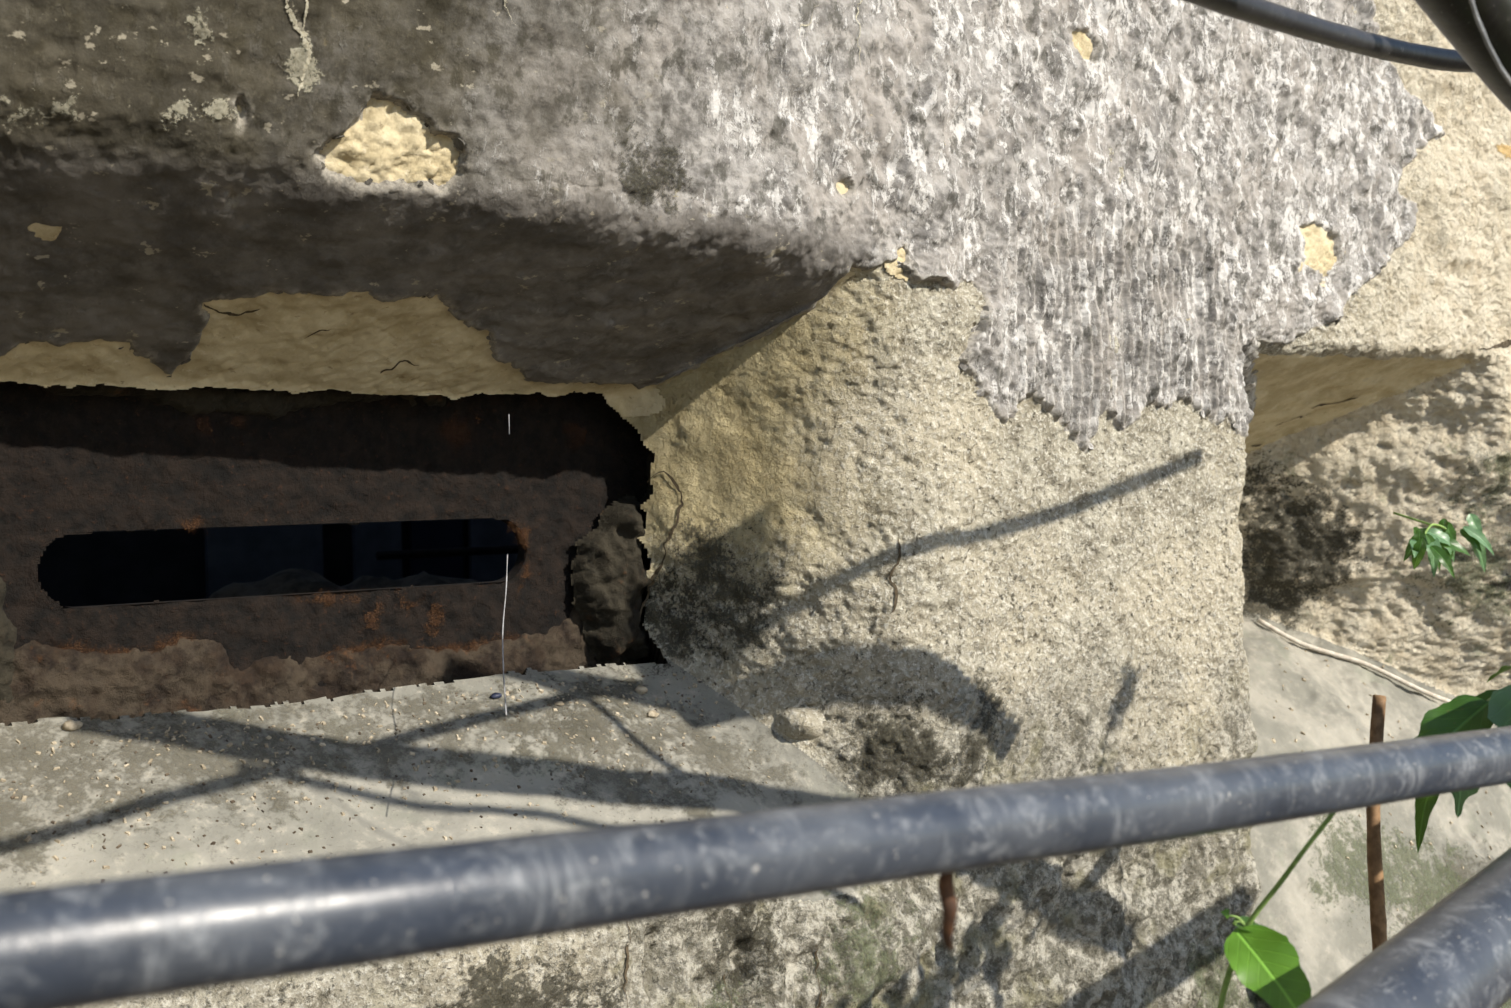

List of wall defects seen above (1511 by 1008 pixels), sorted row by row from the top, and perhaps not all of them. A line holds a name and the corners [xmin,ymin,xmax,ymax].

spalling [319,98,465,186]
spalling [884,247,912,281]
spalling [1298,224,1346,287]
corrosion [25,383,446,420]
spalling [0,291,665,417]
leakage [1239,451,1377,635]
corrosion [0,494,652,726]
leakage [0,515,805,873]
leakage [829,661,1012,797]